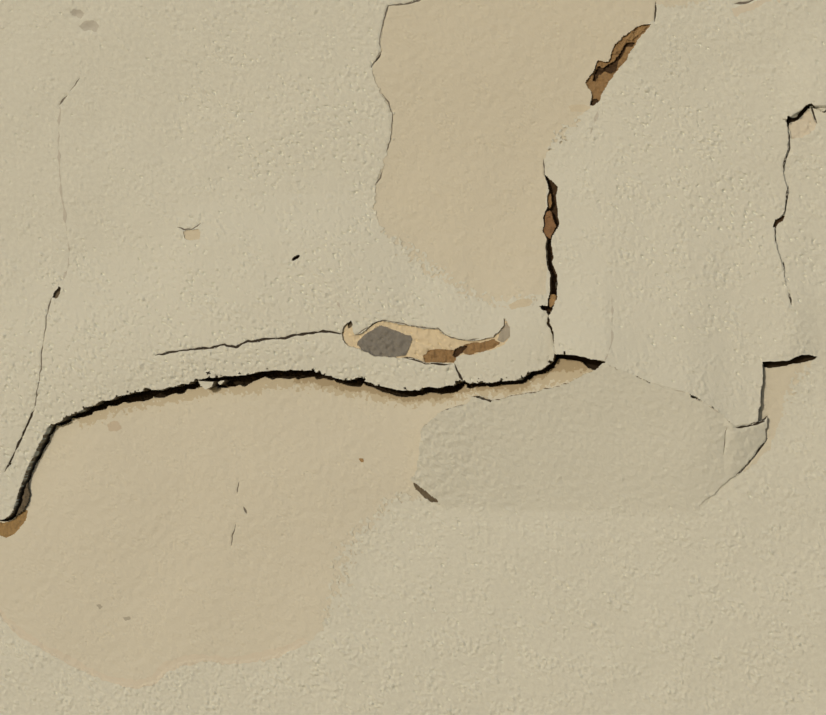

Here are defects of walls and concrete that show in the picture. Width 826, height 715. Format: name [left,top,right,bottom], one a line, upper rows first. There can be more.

crack [57,79,79,280]
crack [375,94,393,185]
peeling [342,0,707,363]
crack [775,104,826,241]
crack [5,298,52,471]
crack [29,159,614,481]
crack [763,355,817,368]
peeling [0,370,594,681]